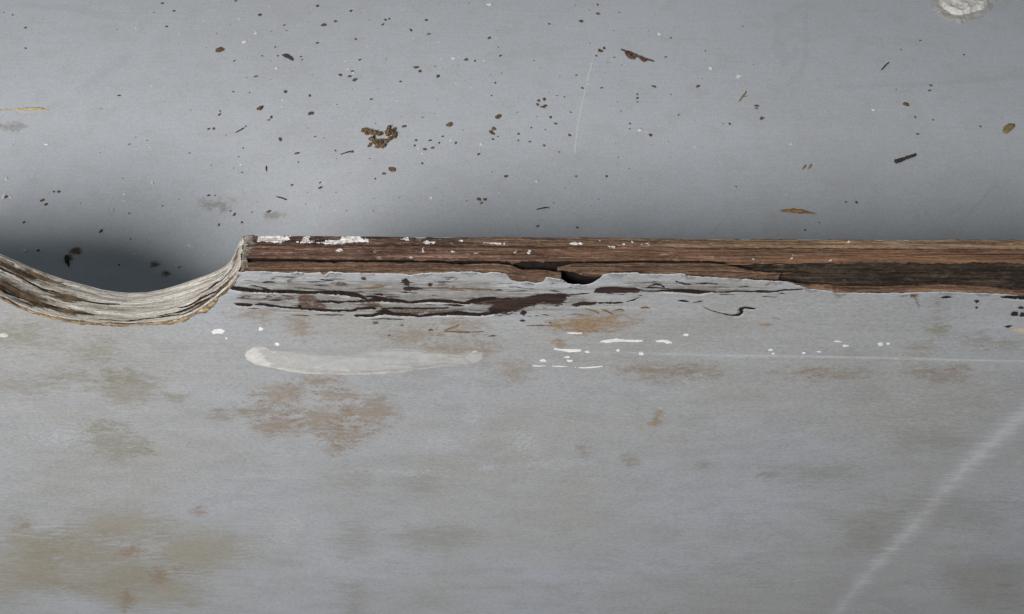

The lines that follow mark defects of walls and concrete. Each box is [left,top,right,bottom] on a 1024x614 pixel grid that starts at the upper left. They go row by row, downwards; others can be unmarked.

peeling [238,274,329,309]
peeling [402,273,477,291]
peeling [473,274,641,322]